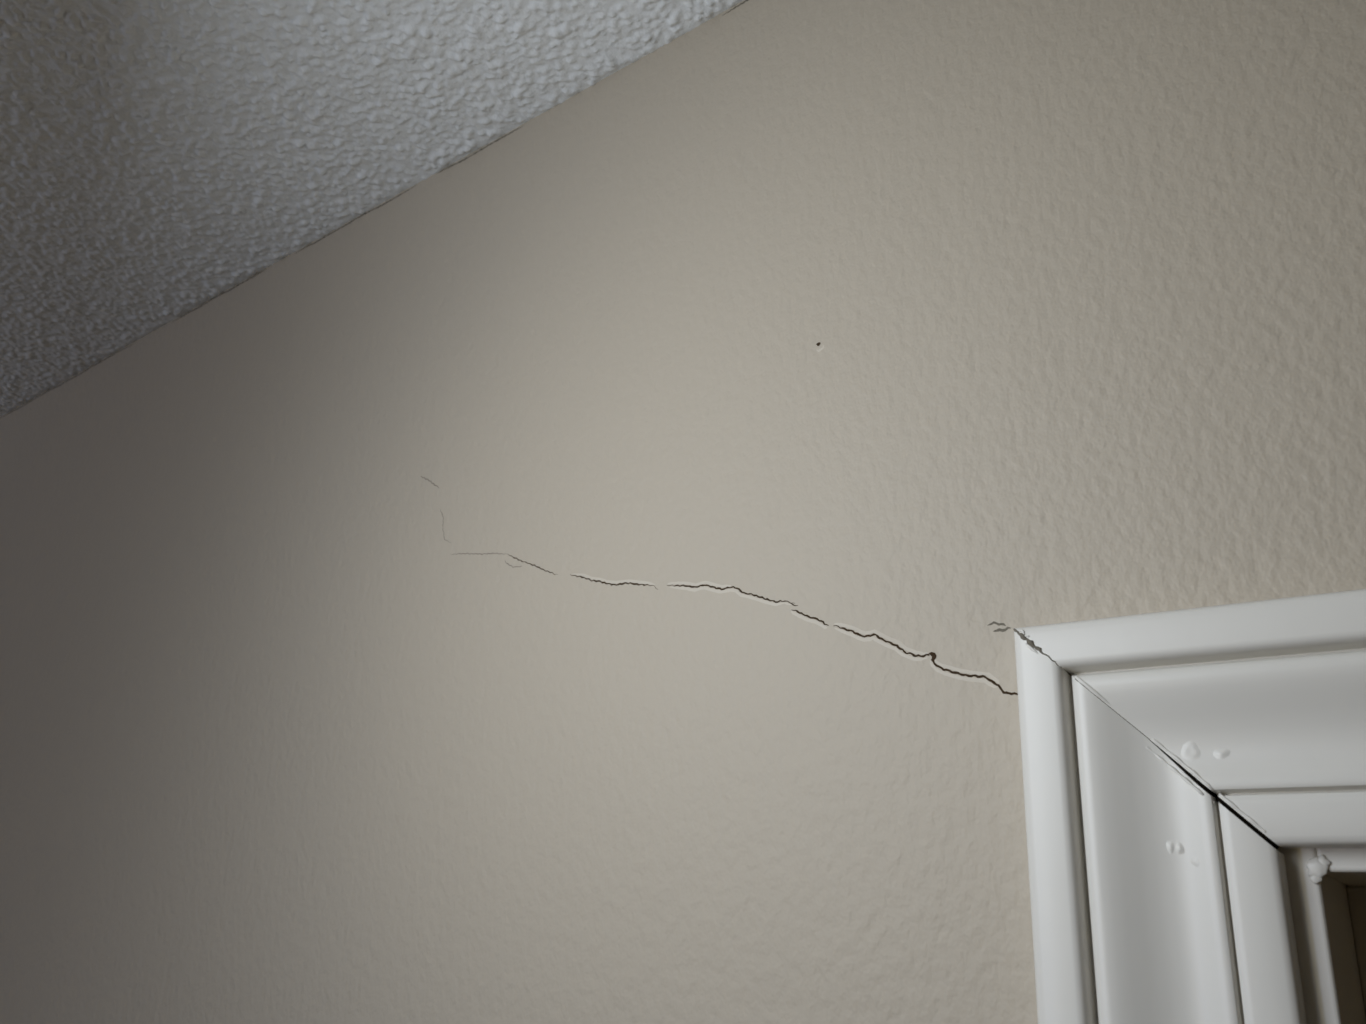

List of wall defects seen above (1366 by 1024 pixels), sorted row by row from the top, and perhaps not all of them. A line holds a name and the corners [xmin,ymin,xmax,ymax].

crack [420,476,1018,695]
crack [987,621,1279,849]